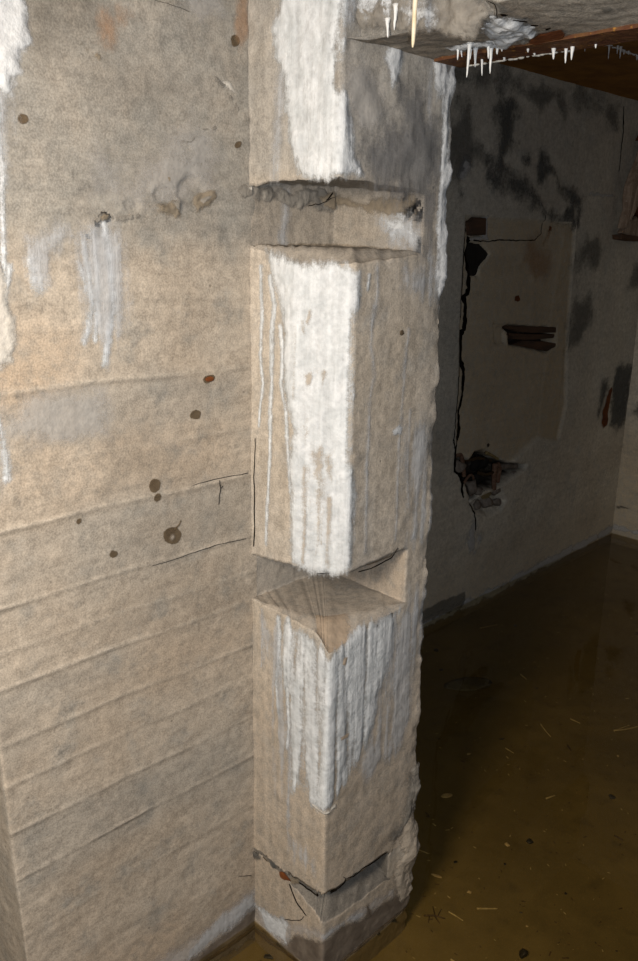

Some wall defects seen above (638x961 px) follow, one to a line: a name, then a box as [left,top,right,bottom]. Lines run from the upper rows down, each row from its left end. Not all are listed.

damp [0,0,32,122]
damp [446,15,571,67]
damp [0,134,17,371]
damp [80,220,122,367]
spalling [238,185,416,242]
damp [272,0,470,297]
damp [258,251,371,577]
crack [453,216,546,531]
damp [598,364,638,428]
crack [358,548,398,572]
damp [262,524,638,815]
damp [162,891,410,961]